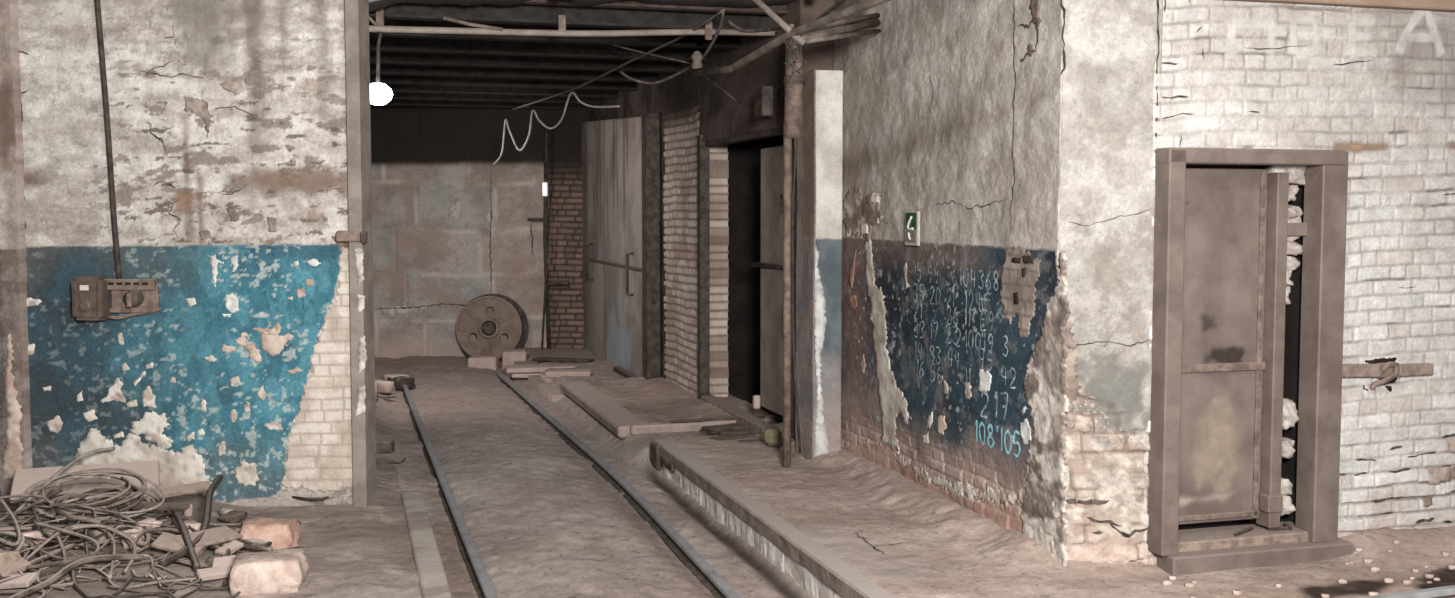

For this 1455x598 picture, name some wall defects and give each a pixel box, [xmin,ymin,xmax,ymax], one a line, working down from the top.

crack [136,26,252,115]
spalling [184,96,212,138]
crack [936,0,1038,231]
crack [1068,209,1150,226]
peeling [199,230,239,318]
peeling [46,415,63,433]
peeling [71,333,259,497]
peeling [229,376,266,423]
peeling [204,323,294,363]
flaking render [264,236,435,493]
peeling [814,247,829,457]
spalling [842,187,1149,567]